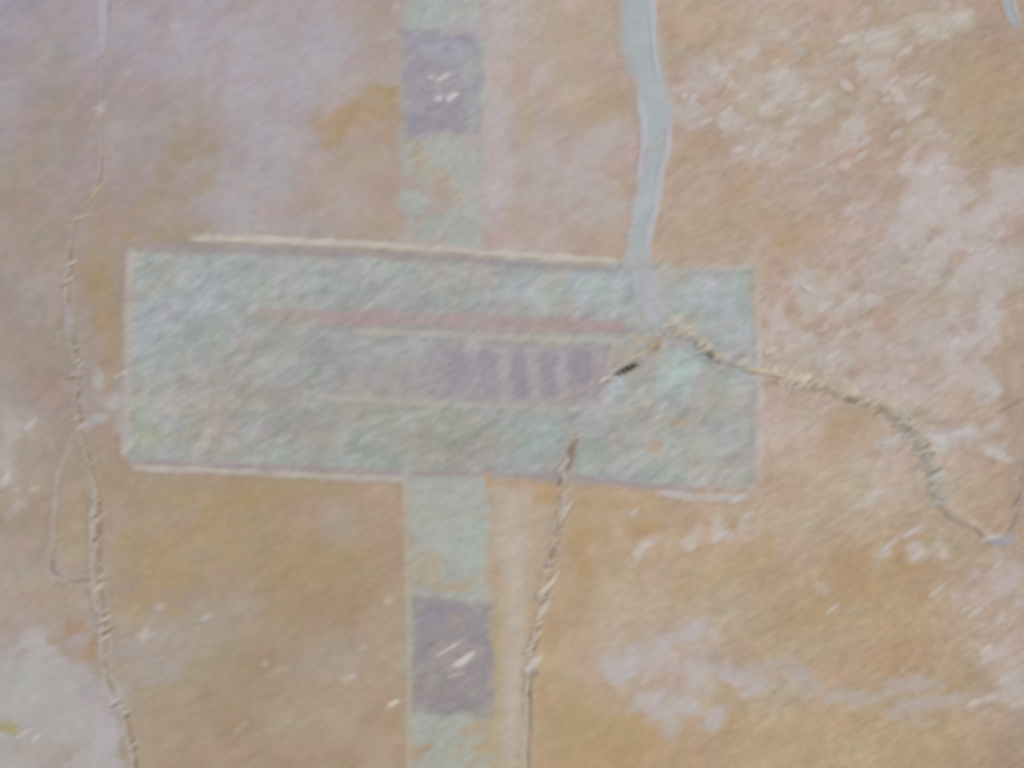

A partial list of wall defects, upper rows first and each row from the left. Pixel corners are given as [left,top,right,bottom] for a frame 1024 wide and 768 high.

crack [513,0,1024,768]